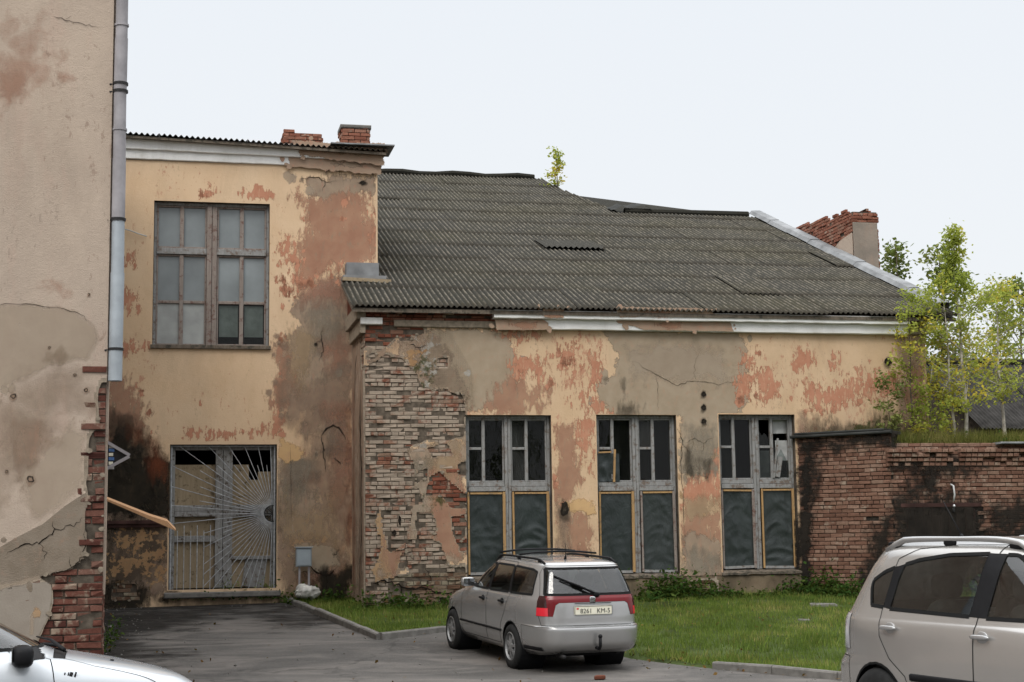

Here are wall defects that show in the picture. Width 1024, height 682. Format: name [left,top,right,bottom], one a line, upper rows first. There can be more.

peeling [124,285,142,317]
flaking render [182,136,388,464]
crack [7,517,86,573]
flaking render [0,306,177,654]
damp [104,580,149,609]
damp [107,417,170,545]
crack [321,391,362,479]
flaking render [365,304,925,606]
damp [792,416,1024,593]